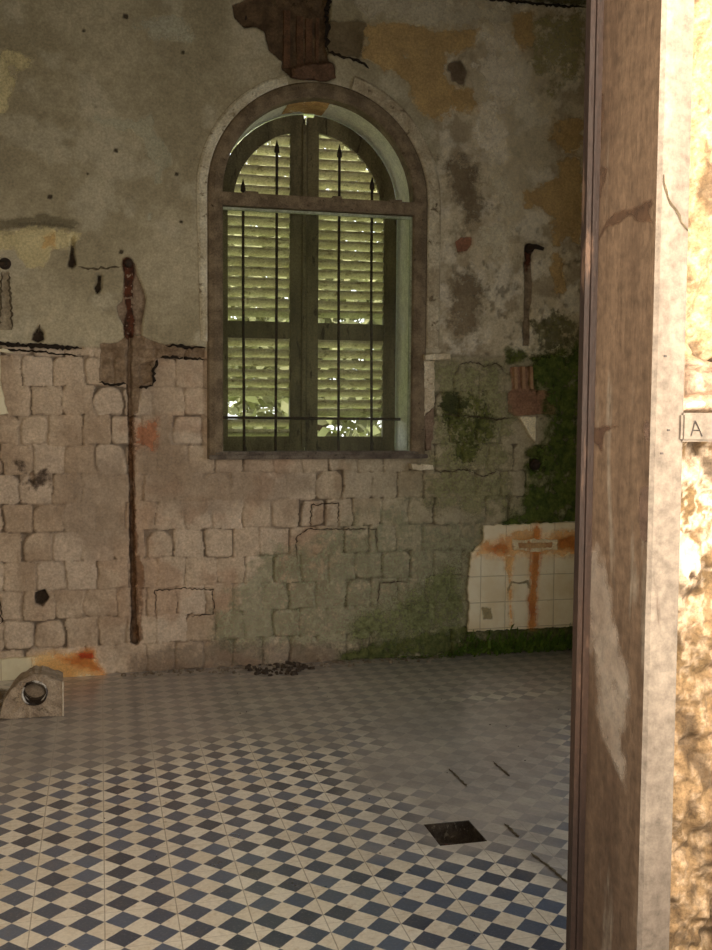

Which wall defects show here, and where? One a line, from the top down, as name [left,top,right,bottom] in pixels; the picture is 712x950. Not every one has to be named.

spalling [232,0,336,82]
spalling [447,61,467,86]
peeling [0,226,80,268]
peeling [524,157,582,294]
corrosion [482,527,575,627]
corrosion [36,650,103,677]